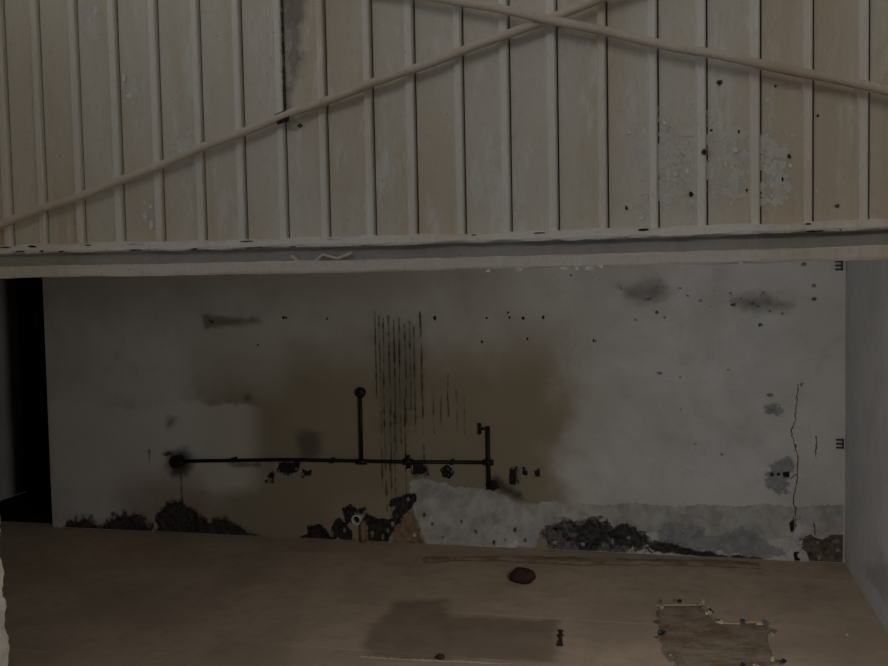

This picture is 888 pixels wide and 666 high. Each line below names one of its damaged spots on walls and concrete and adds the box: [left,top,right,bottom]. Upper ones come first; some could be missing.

crack [789,385,817,534]
peeling [300,493,433,545]
flaking render [789,519,843,562]
peeling [653,599,787,666]